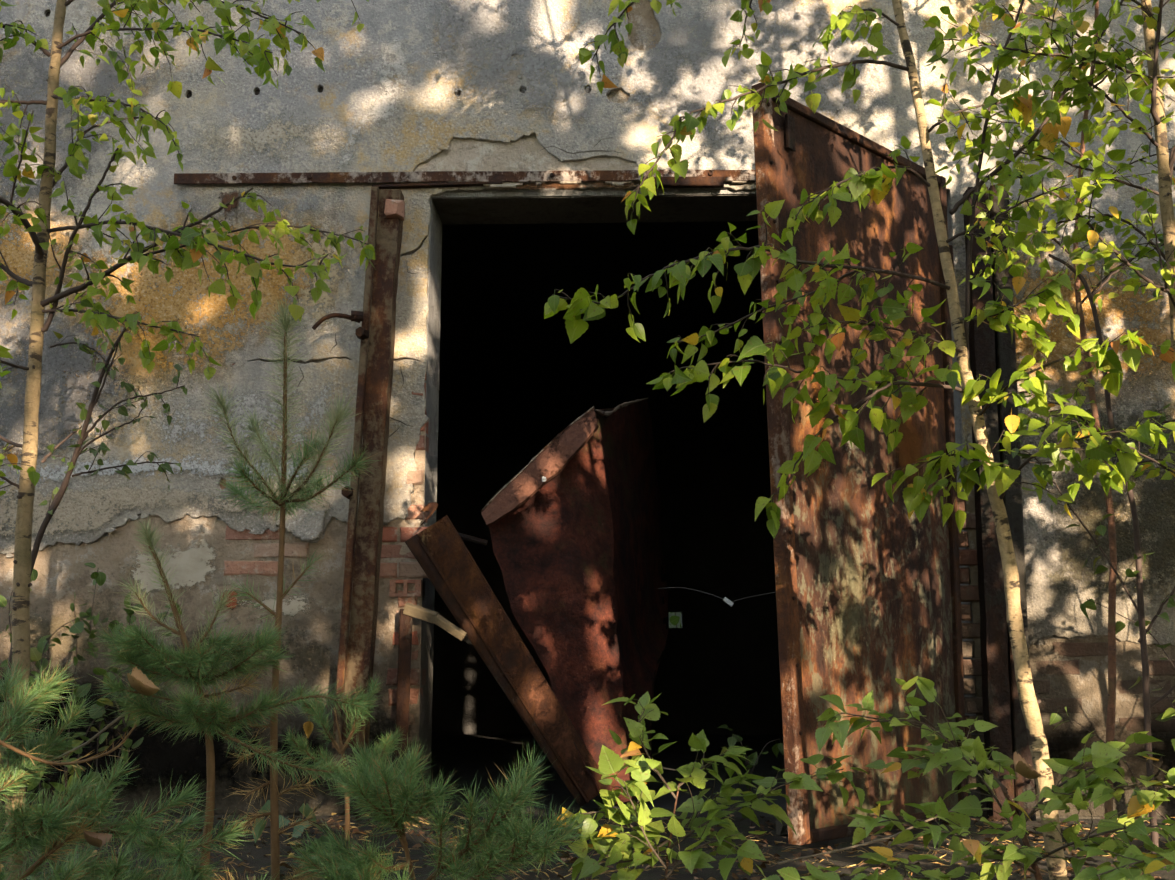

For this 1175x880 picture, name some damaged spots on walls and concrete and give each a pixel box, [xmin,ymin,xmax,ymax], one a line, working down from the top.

crack [540,137,620,154]
rust [809,347,821,404]
spalling [0,445,22,537]
rust [893,409,925,486]
spalling [0,553,14,678]
spalling [26,382,429,813]